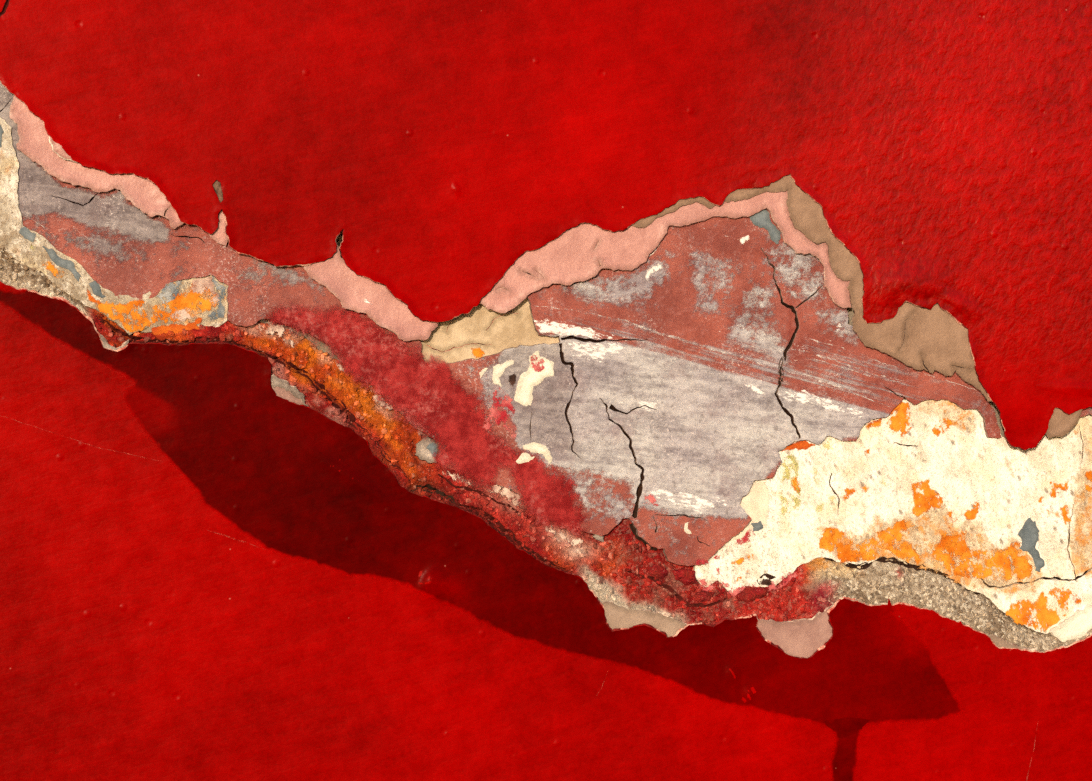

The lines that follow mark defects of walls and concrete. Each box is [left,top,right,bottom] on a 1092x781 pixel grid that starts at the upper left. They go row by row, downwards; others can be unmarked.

crack [0,0,9,17]
peeling [0,82,1092,658]
crack [559,335,643,455]
crack [767,258,818,438]
crack [603,403,726,608]